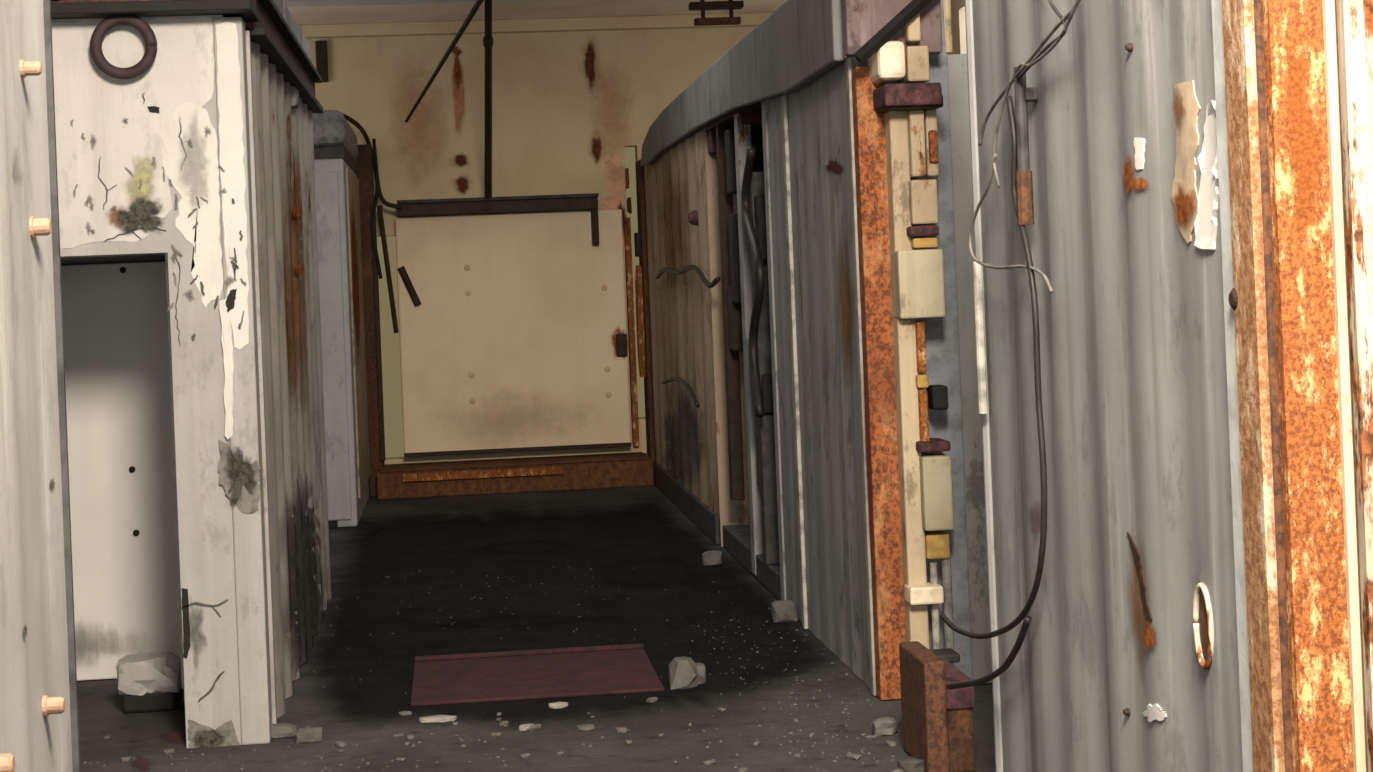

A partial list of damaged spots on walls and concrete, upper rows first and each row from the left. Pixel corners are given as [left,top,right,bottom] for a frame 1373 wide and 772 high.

water stain [118,160,161,233]
crack [98,156,181,344]
peeling [52,17,261,514]
crack [178,119,187,170]
rust [284,170,307,382]
rust [452,47,464,129]
rust [585,44,595,88]
rust [1123,138,1148,194]
peeling [1171,80,1219,249]
rust [1262,0,1354,772]
water stain [287,493,324,668]
rust [1126,532,1156,652]